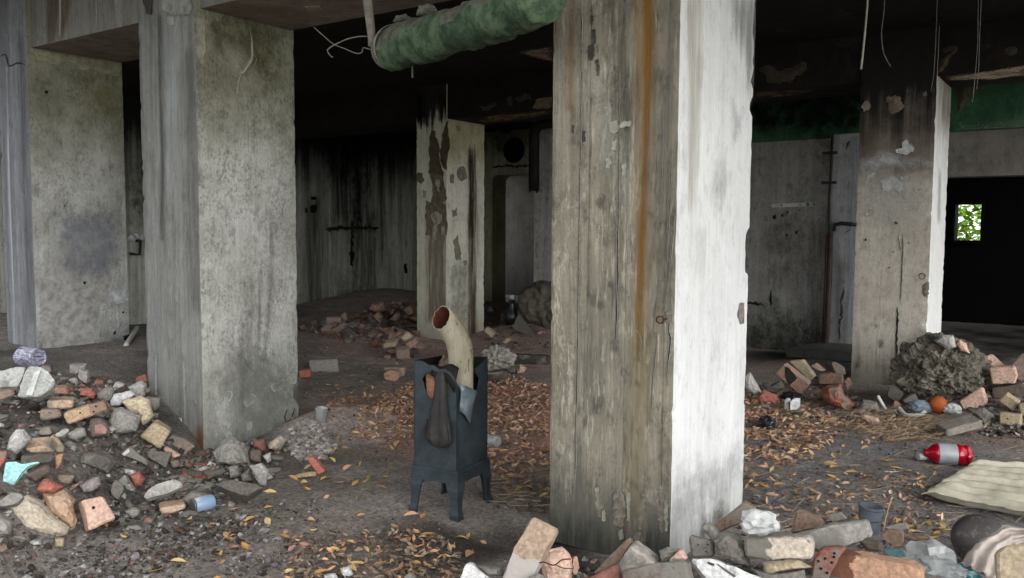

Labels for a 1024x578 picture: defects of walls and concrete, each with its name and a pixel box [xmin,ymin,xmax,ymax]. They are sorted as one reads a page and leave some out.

peeling [417,121,467,266]
water stain [427,148,477,335]
corrosion [637,204,645,356]
corrosion [644,0,652,156]
crack [837,286,845,340]
peeling [886,95,905,115]
peeling [896,139,914,155]